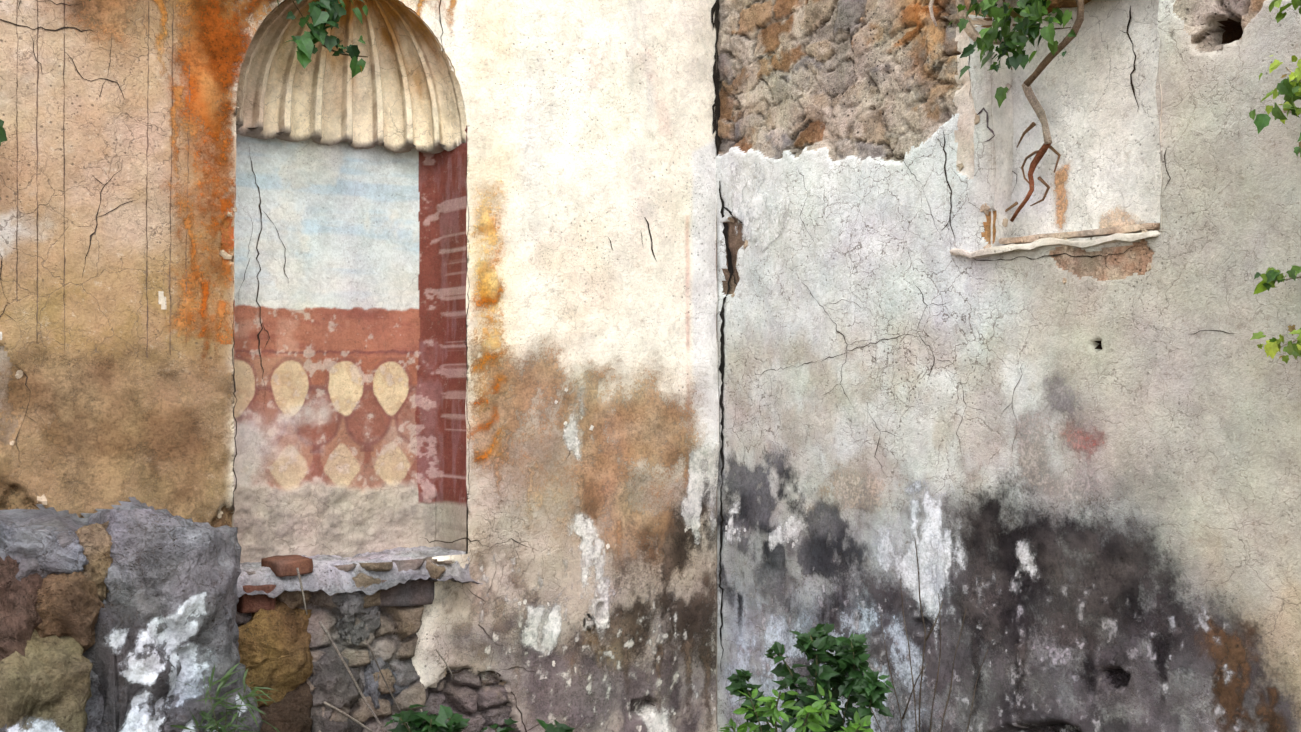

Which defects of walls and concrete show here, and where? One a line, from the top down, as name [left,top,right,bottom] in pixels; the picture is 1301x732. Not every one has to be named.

crack [0,0,125,100]
corrosion [416,0,456,23]
crack [82,159,135,277]
corrosion [72,0,279,347]
flaking render [722,163,790,297]
crack [232,145,291,511]
crack [711,0,1025,668]
spalling [0,485,47,510]
damp [467,339,701,570]
damp [808,464,883,512]
damp [1013,377,1109,501]
damp [453,481,1301,732]